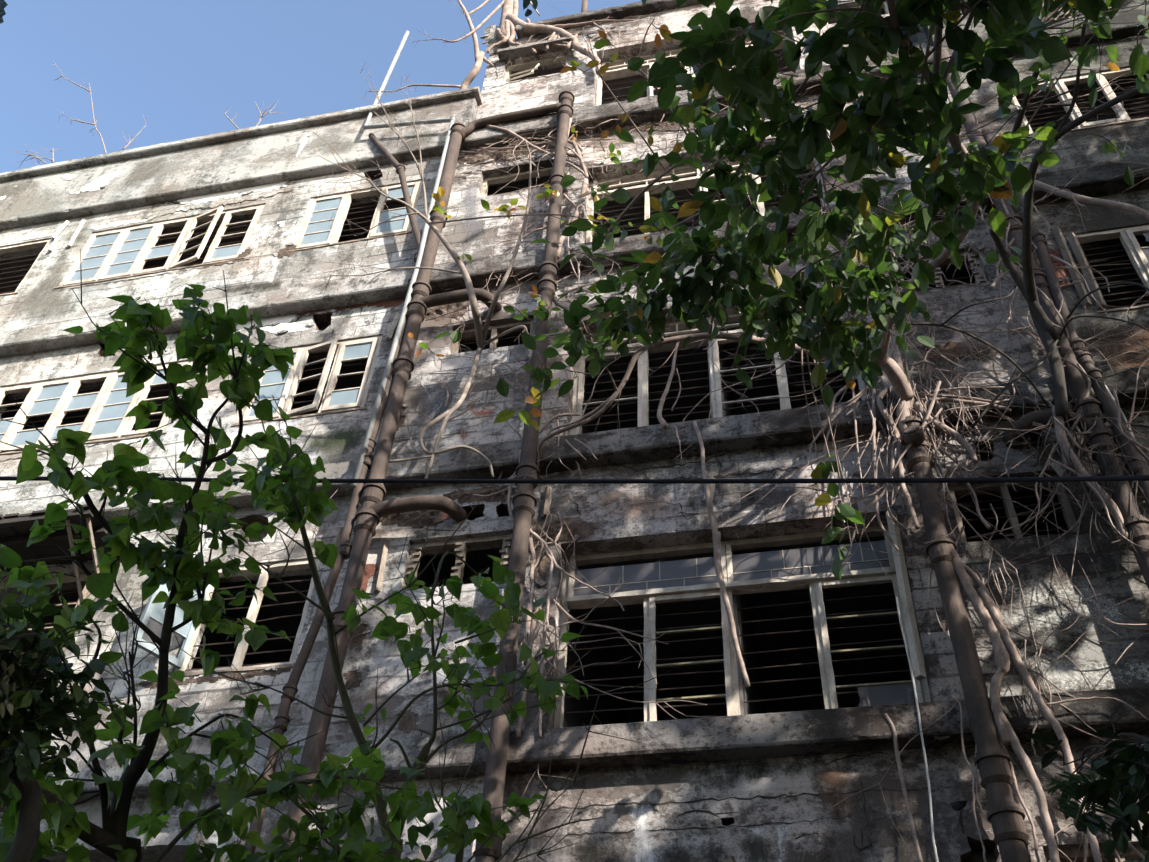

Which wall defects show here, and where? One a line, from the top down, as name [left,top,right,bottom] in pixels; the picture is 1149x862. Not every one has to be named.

peeling [62,171,122,194]
crack [517,752,979,857]
water stain [579,806,728,862]
water stain [742,827,784,862]